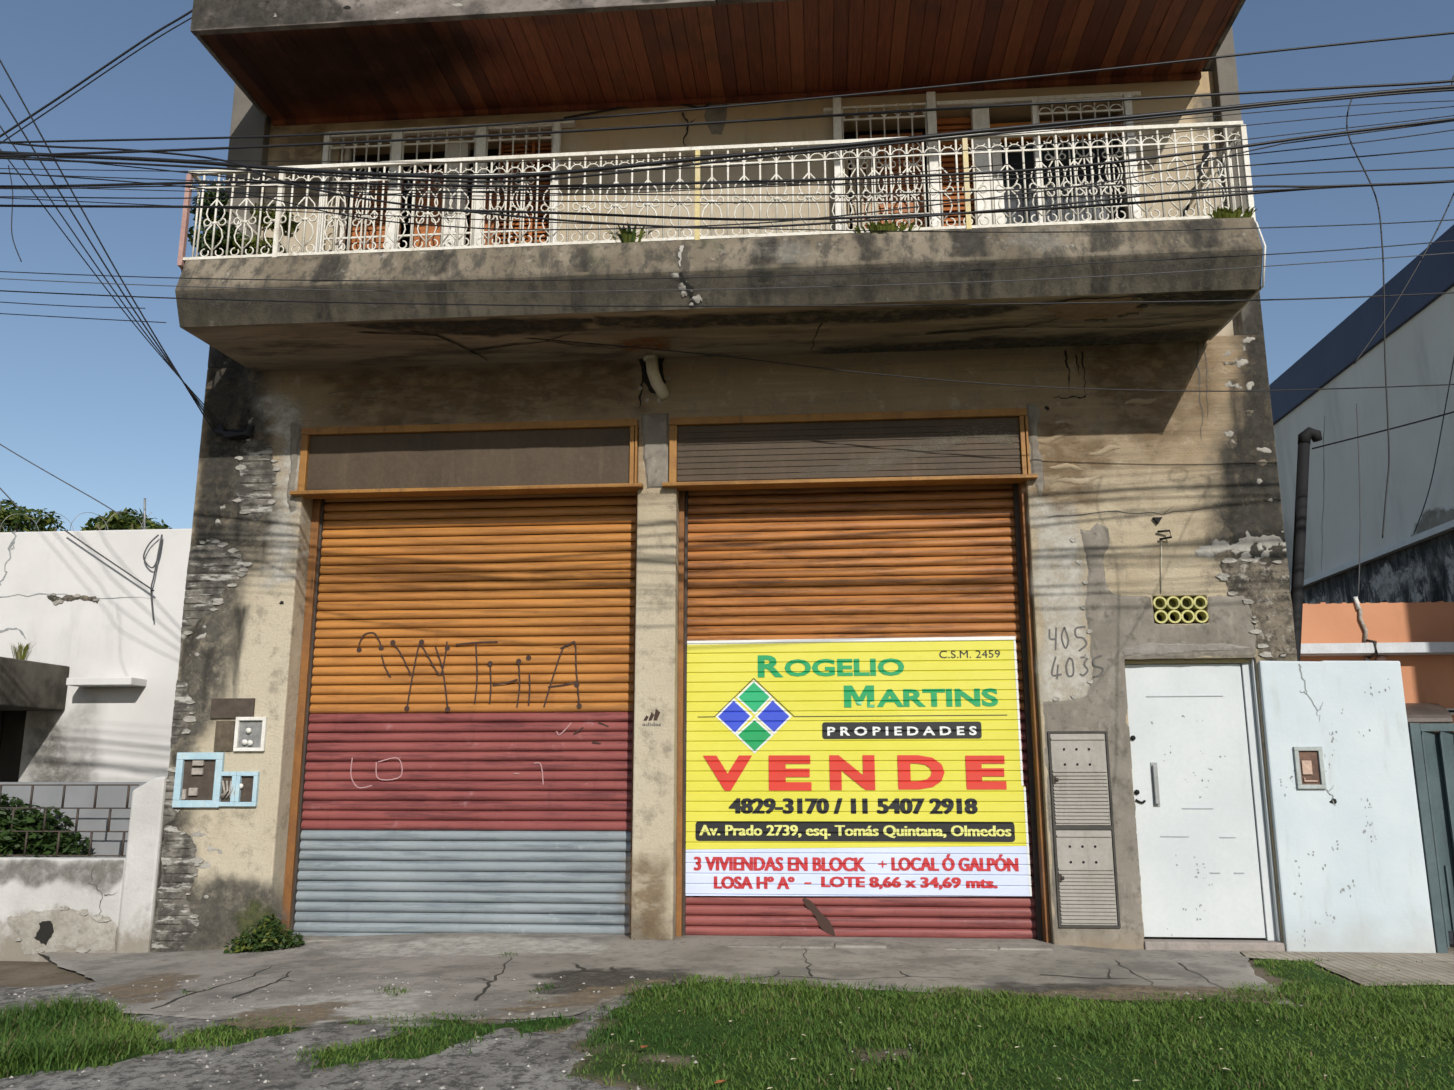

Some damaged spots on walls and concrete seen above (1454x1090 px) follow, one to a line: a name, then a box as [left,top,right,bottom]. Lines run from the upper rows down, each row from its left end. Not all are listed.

leakage [350,228,1020,337]
leakage [822,329,1210,439]
leakage [1132,219,1292,585]
crack [0,530,150,639]
spalling [181,417,281,656]
leakage [173,350,302,775]
peeling [1034,501,1093,702]
spalling [1194,531,1328,659]
spalling [170,680,196,748]
crack [1299,664,1323,721]
leakage [155,808,188,915]
spalling [151,767,223,951]